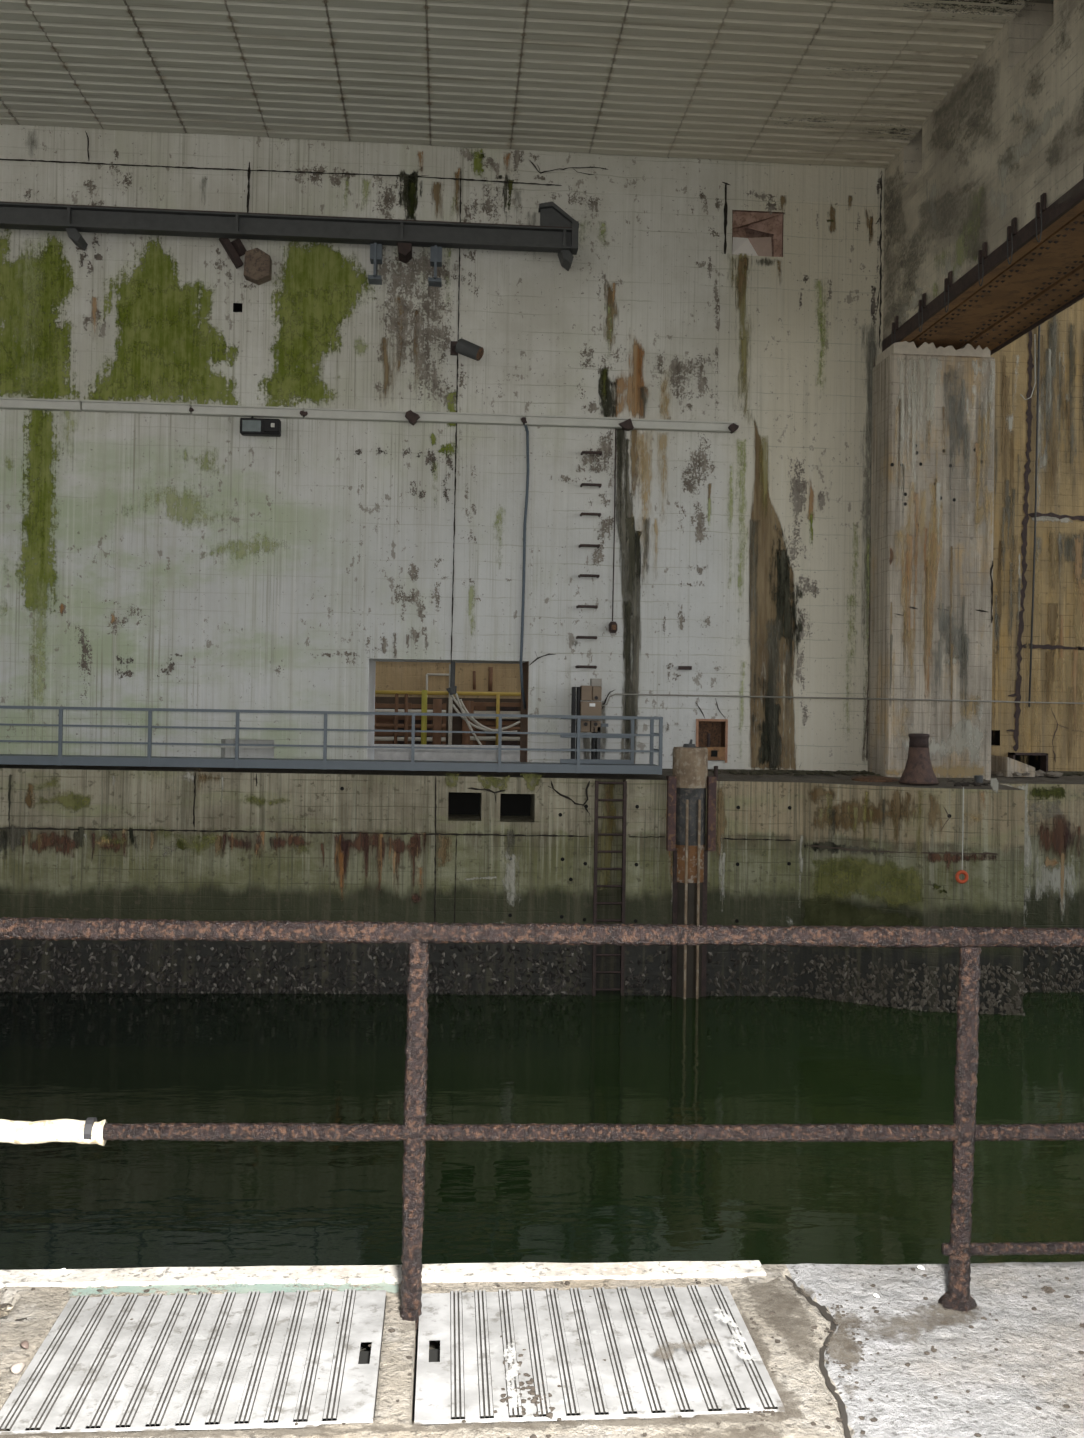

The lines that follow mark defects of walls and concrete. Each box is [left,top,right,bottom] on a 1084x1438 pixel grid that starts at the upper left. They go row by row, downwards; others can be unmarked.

leakage [895,0,1032,19]
rust [604,282,618,346]
rust [616,340,669,552]
leakage [862,327,876,645]
leakage [896,358,995,489]
rust [215,831,426,903]
rust [1037,815,1081,867]
crack [785,1275,851,1438]